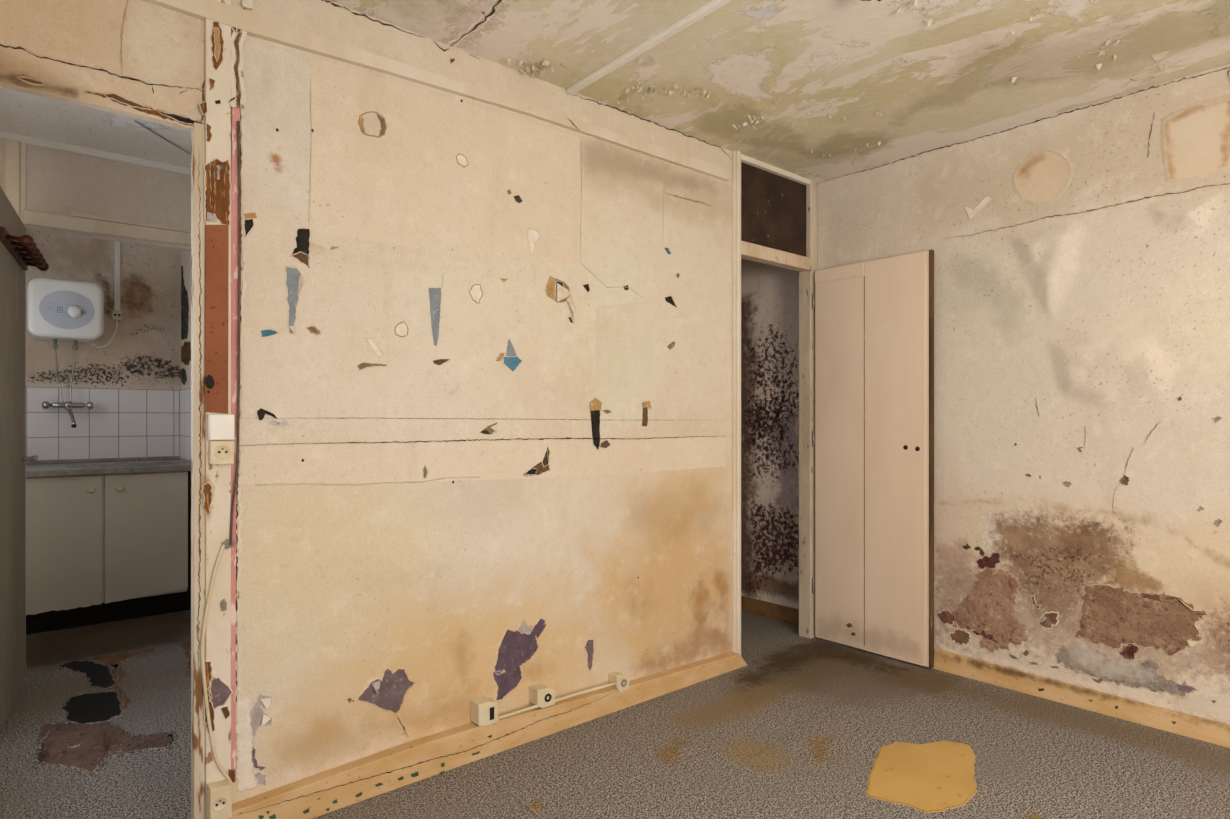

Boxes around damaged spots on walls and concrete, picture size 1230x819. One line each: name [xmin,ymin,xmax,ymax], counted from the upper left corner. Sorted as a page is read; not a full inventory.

crack [306,0,508,59]
crack [0,43,205,94]
peeling [199,21,241,143]
peeling [203,158,232,226]
leakage [27,353,181,387]
leakage [741,298,799,600]
peeling [346,666,416,715]
peeling [490,616,546,702]
leakage [937,515,1156,692]
spalling [936,543,1208,697]
leakage [1206,616,1230,671]